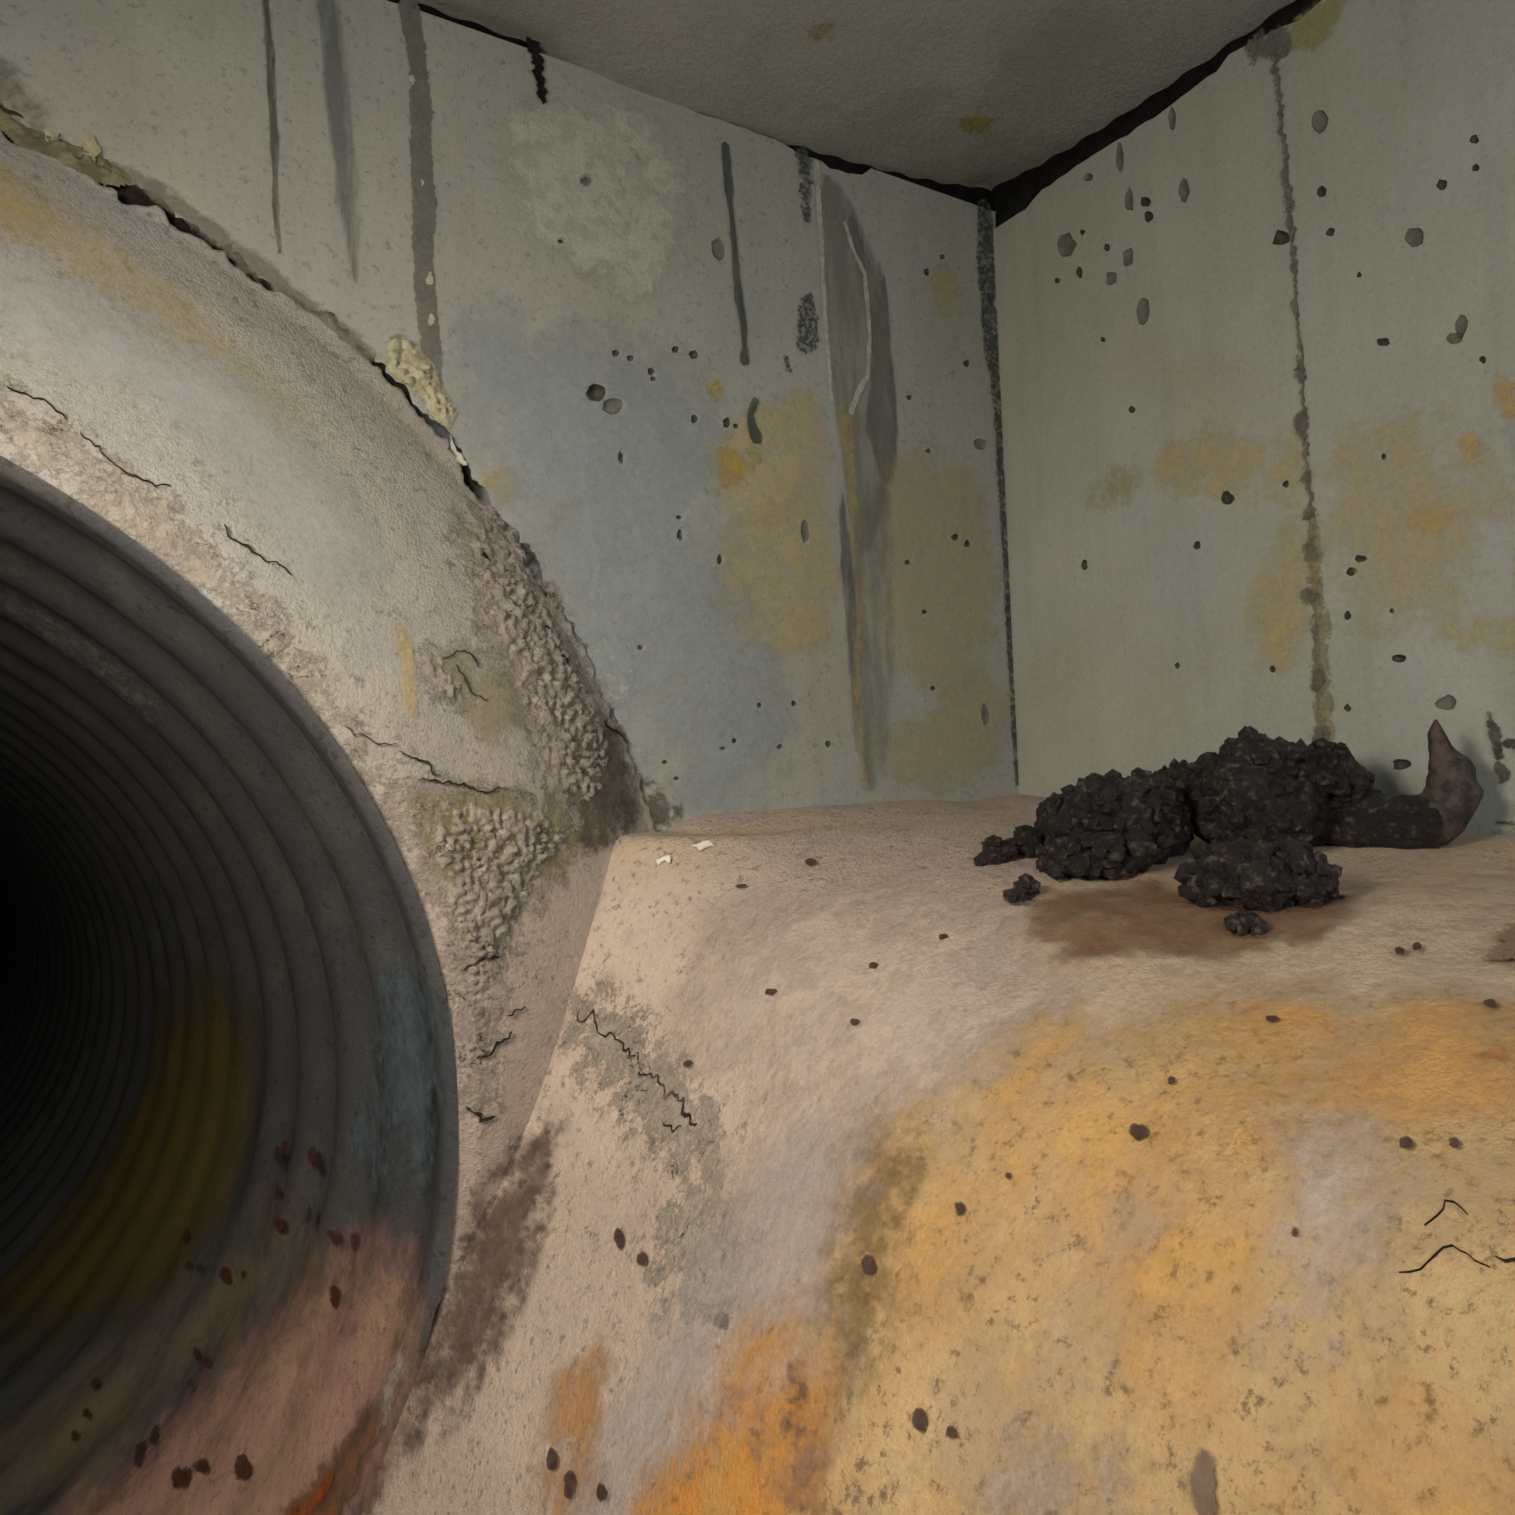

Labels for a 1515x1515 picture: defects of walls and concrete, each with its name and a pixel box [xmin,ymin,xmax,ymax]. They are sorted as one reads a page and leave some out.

crack [0,104,23,144]
damp [263,0,279,228]
damp [319,0,350,239]
crack [7,386,171,487]
crack [97,182,588,665]
damp [385,0,897,850]
crack [442,650,488,701]
crack [604,708,629,742]
crack [577,1009,698,1133]